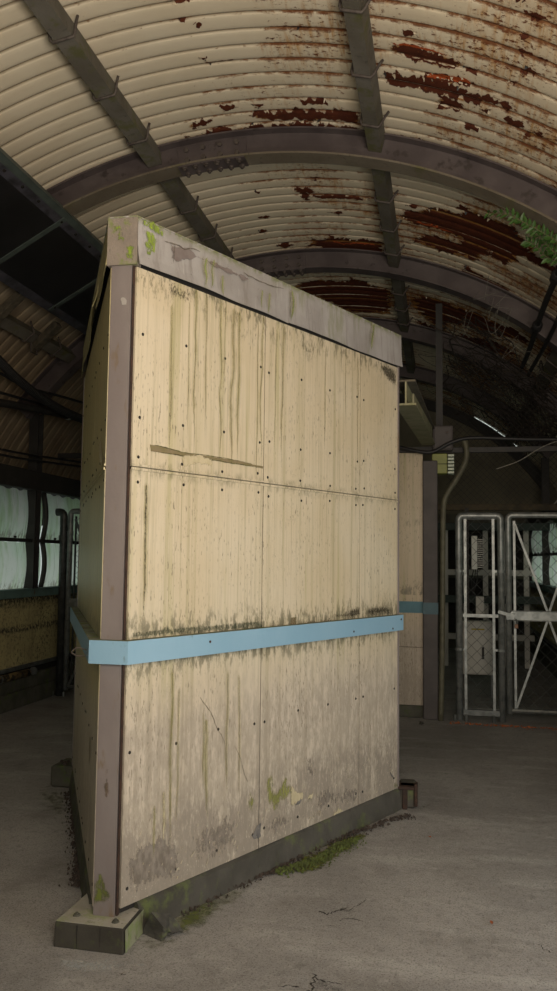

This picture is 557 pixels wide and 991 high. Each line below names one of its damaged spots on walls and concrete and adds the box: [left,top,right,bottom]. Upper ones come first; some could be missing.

rust [384,29,548,137]
rust [184,97,360,138]
rust [292,177,363,202]
rust [308,234,385,252]
rust [396,204,557,291]
rust [295,277,392,314]
peeling [150,445,263,469]
water stain [307,607,390,623]
water stain [133,623,262,637]
peeling [290,786,356,816]
crack [318,898,366,926]
crack [281,973,342,991]